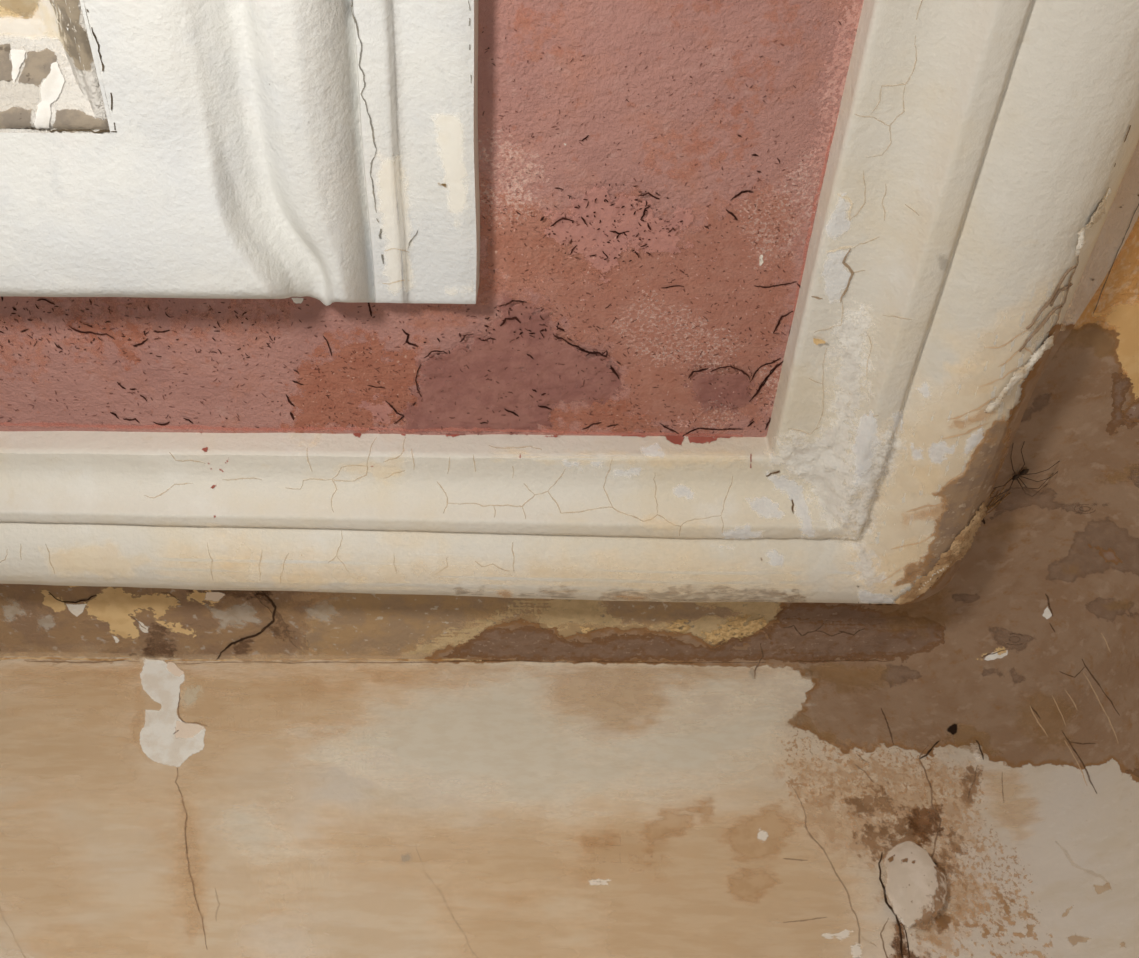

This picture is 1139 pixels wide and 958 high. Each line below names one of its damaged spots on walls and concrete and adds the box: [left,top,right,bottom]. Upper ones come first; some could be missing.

crack [351,0,384,264]
crack [754,281,801,334]
crack [110,382,193,425]
crack [660,361,783,437]
damp [0,323,1139,803]
peeling [41,585,225,643]
peeling [407,599,781,655]
spalling [140,658,207,767]
damp [844,784,966,876]
crack [791,785,910,958]
damp [891,922,919,958]
damp [935,914,951,933]